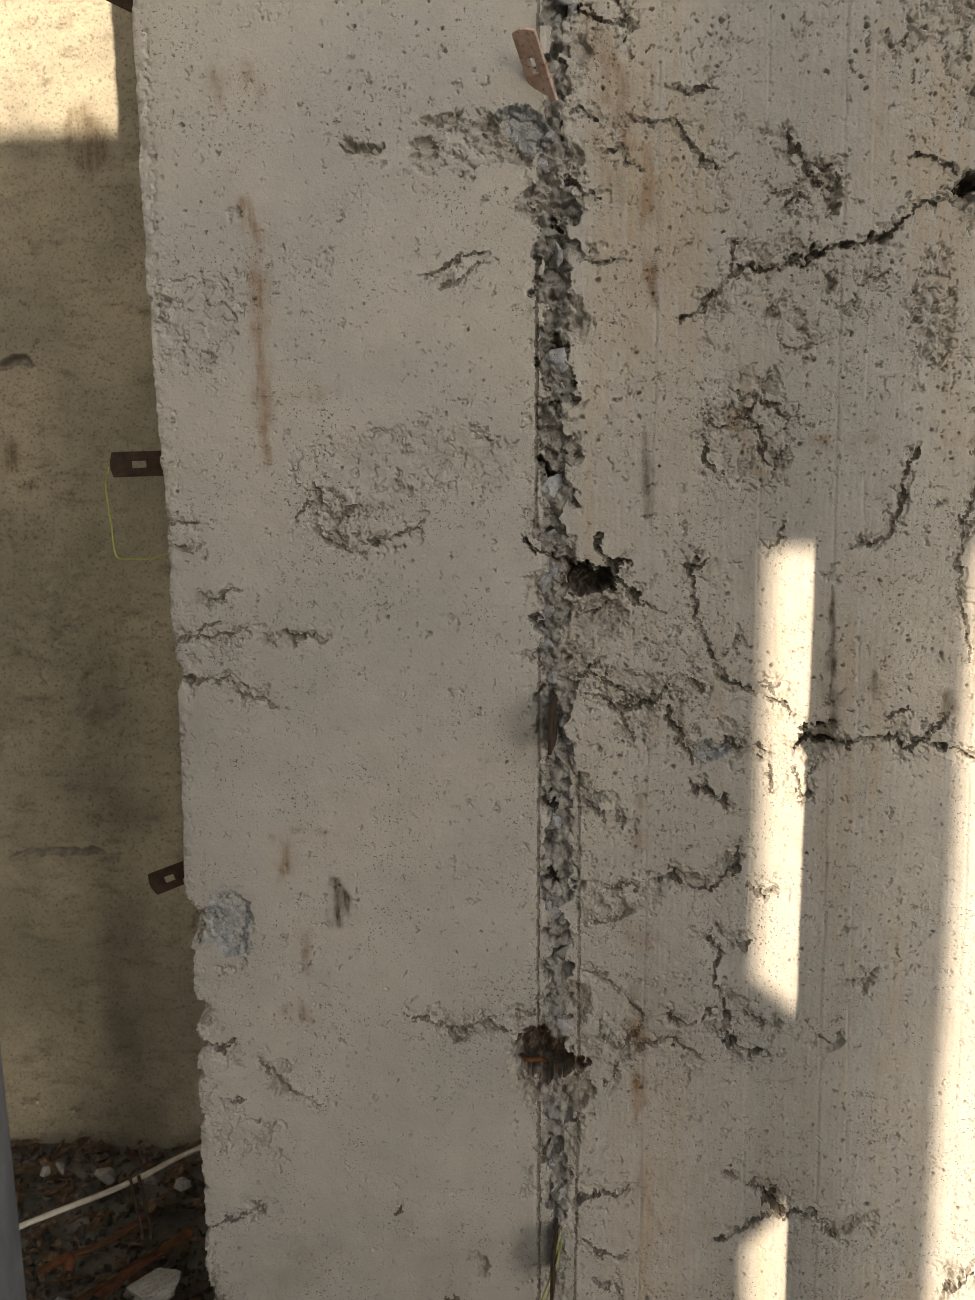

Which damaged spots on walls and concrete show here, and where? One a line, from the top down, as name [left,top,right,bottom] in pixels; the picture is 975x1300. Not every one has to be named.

peeling [887,0,975,59]
crack [569,81,720,173]
spalling [947,164,975,226]
crack [679,151,958,325]
peeling [909,264,968,374]
spalling [558,590,626,678]
crack [584,552,797,810]
crack [839,705,975,759]
crack [763,763,816,803]
spalling [190,889,256,958]
spalling [572,879,638,925]
crack [713,1164,837,1242]